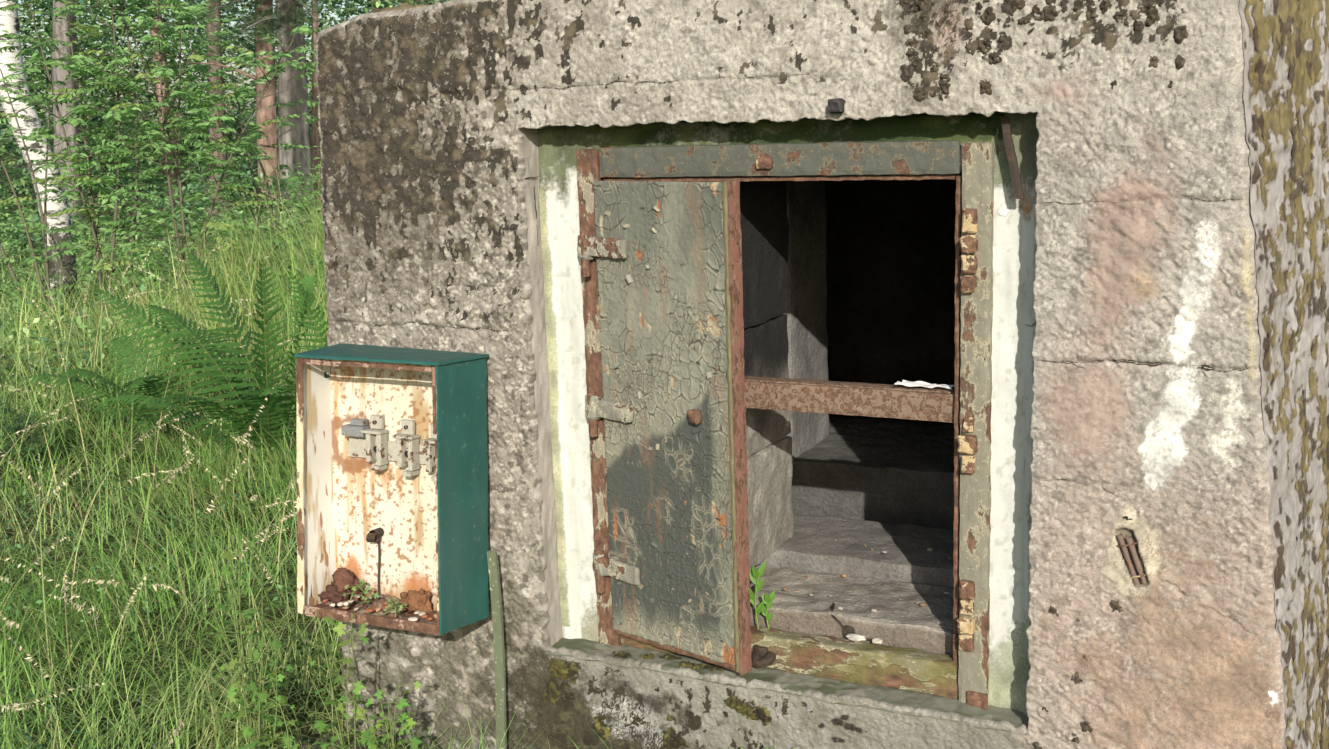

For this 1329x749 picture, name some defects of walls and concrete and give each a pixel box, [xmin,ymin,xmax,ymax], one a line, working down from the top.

water stain [1137,221,1254,490]
peeling [635,415,676,458]
spalling [1099,504,1161,608]
water stain [477,623,764,749]
water stain [765,695,813,726]